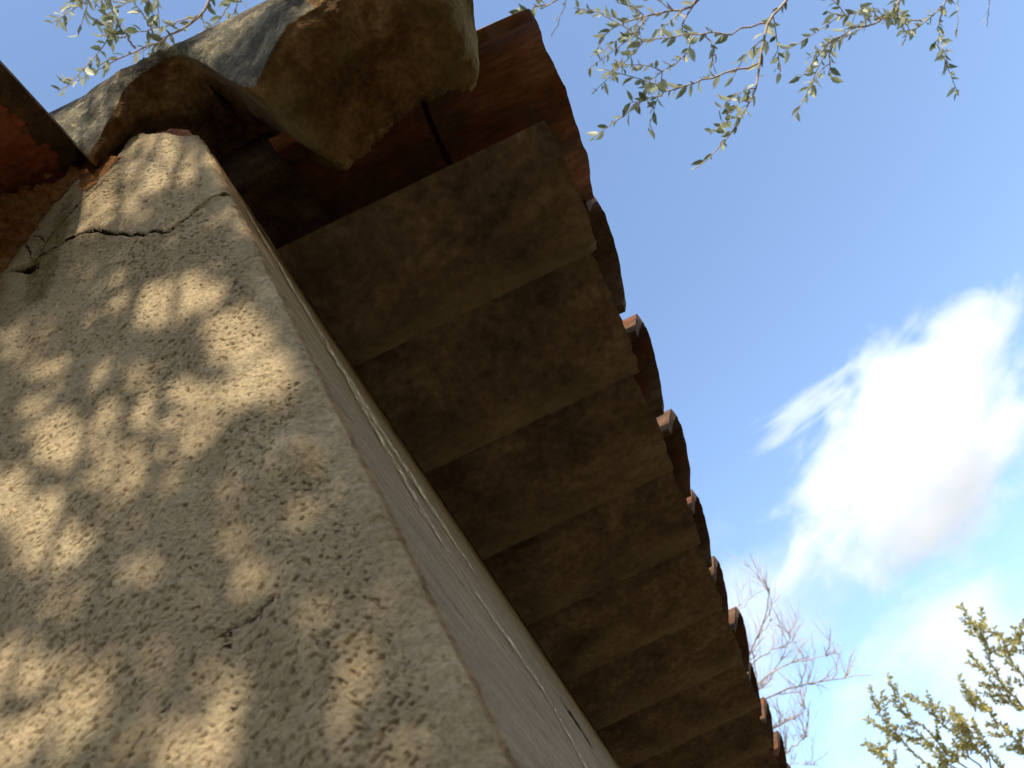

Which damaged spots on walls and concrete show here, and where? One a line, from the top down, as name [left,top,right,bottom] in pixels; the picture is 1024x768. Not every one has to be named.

crack [17,180,223,275]